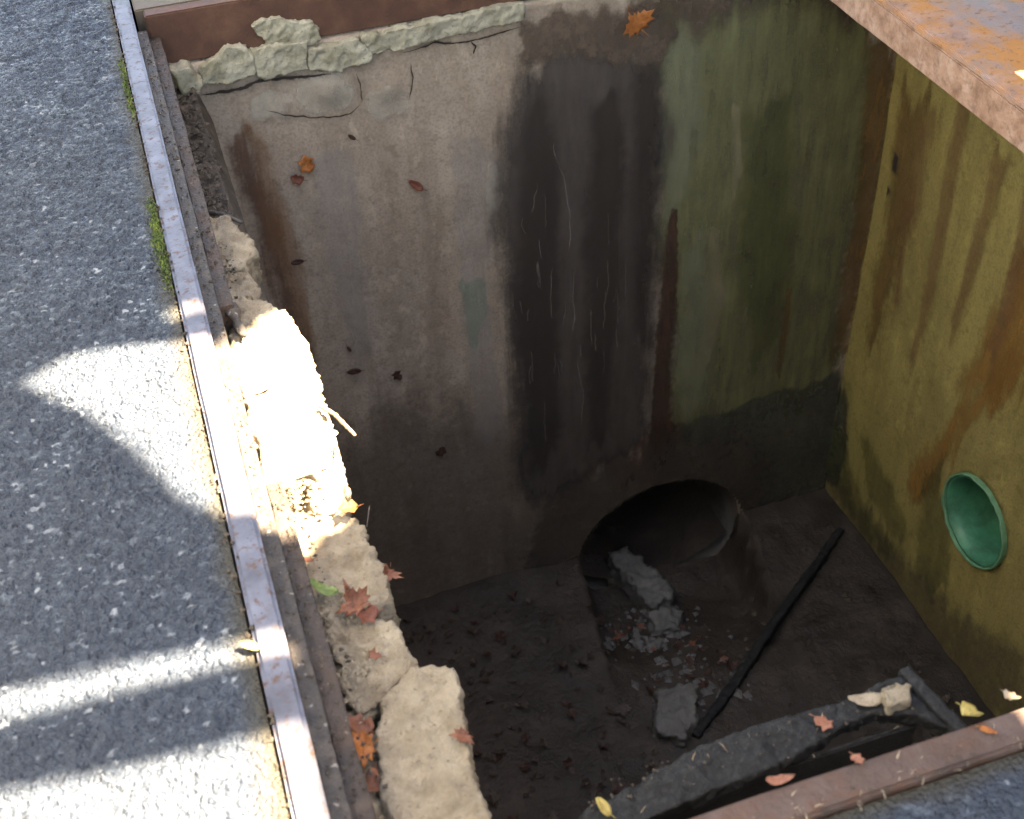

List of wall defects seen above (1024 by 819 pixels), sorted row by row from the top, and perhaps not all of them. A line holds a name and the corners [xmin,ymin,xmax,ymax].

crack [203,74,328,95]
crack [270,73,362,118]
corrosion [606,209,681,477]
damp [492,0,853,569]
corrosion [831,41,931,360]